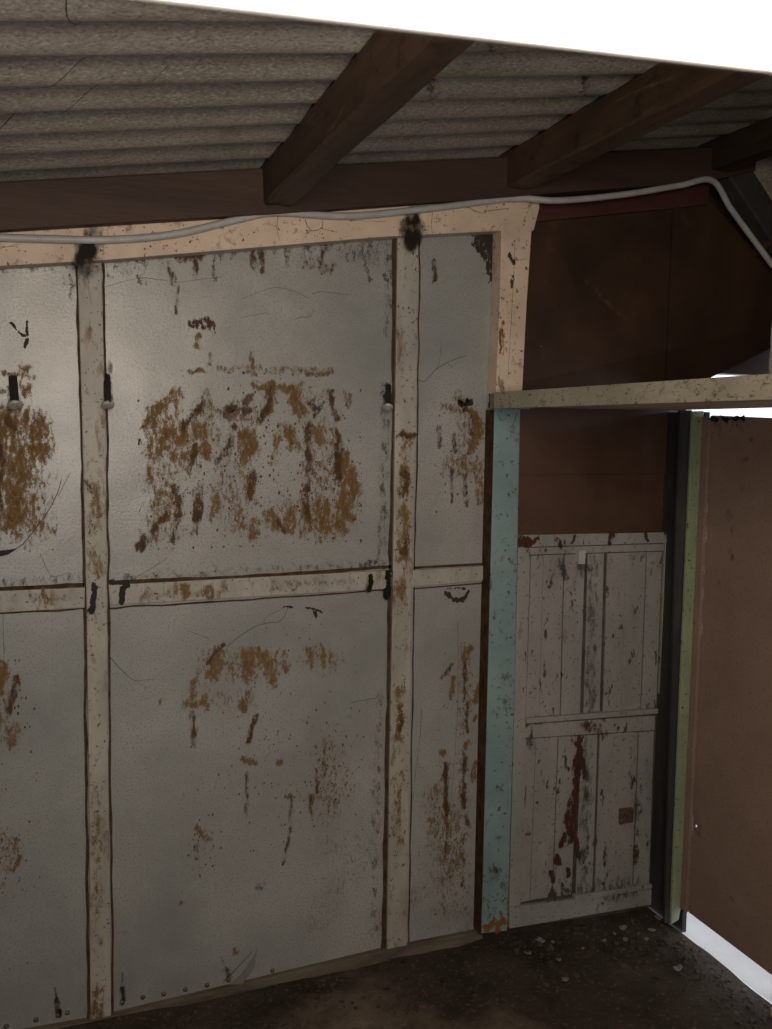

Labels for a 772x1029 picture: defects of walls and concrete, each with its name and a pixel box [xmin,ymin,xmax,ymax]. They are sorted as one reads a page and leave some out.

corrosion [0,363,57,550]
corrosion [134,353,362,553]
corrosion [0,659,36,765]
corrosion [182,623,364,877]
corrosion [418,390,510,934]
corrosion [0,827,40,909]